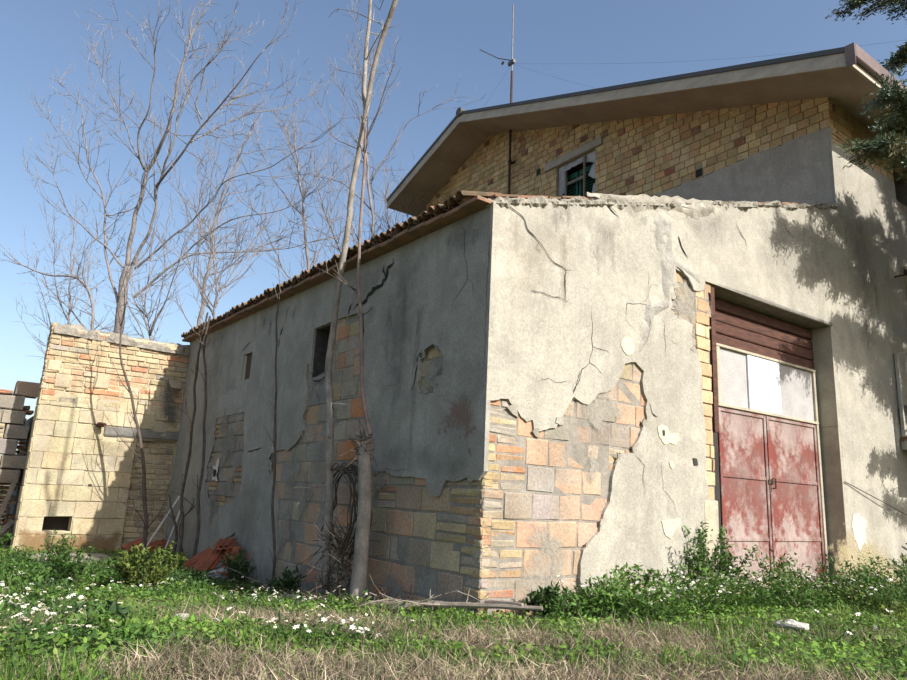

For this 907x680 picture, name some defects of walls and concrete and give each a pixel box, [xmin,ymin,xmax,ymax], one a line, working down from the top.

crack [347,258,394,356]
crack [496,200,606,393]
crack [626,284,675,353]
damp [164,379,179,422]
flaking render [206,412,247,524]
flaking render [267,312,647,618]
peeling [658,424,680,445]